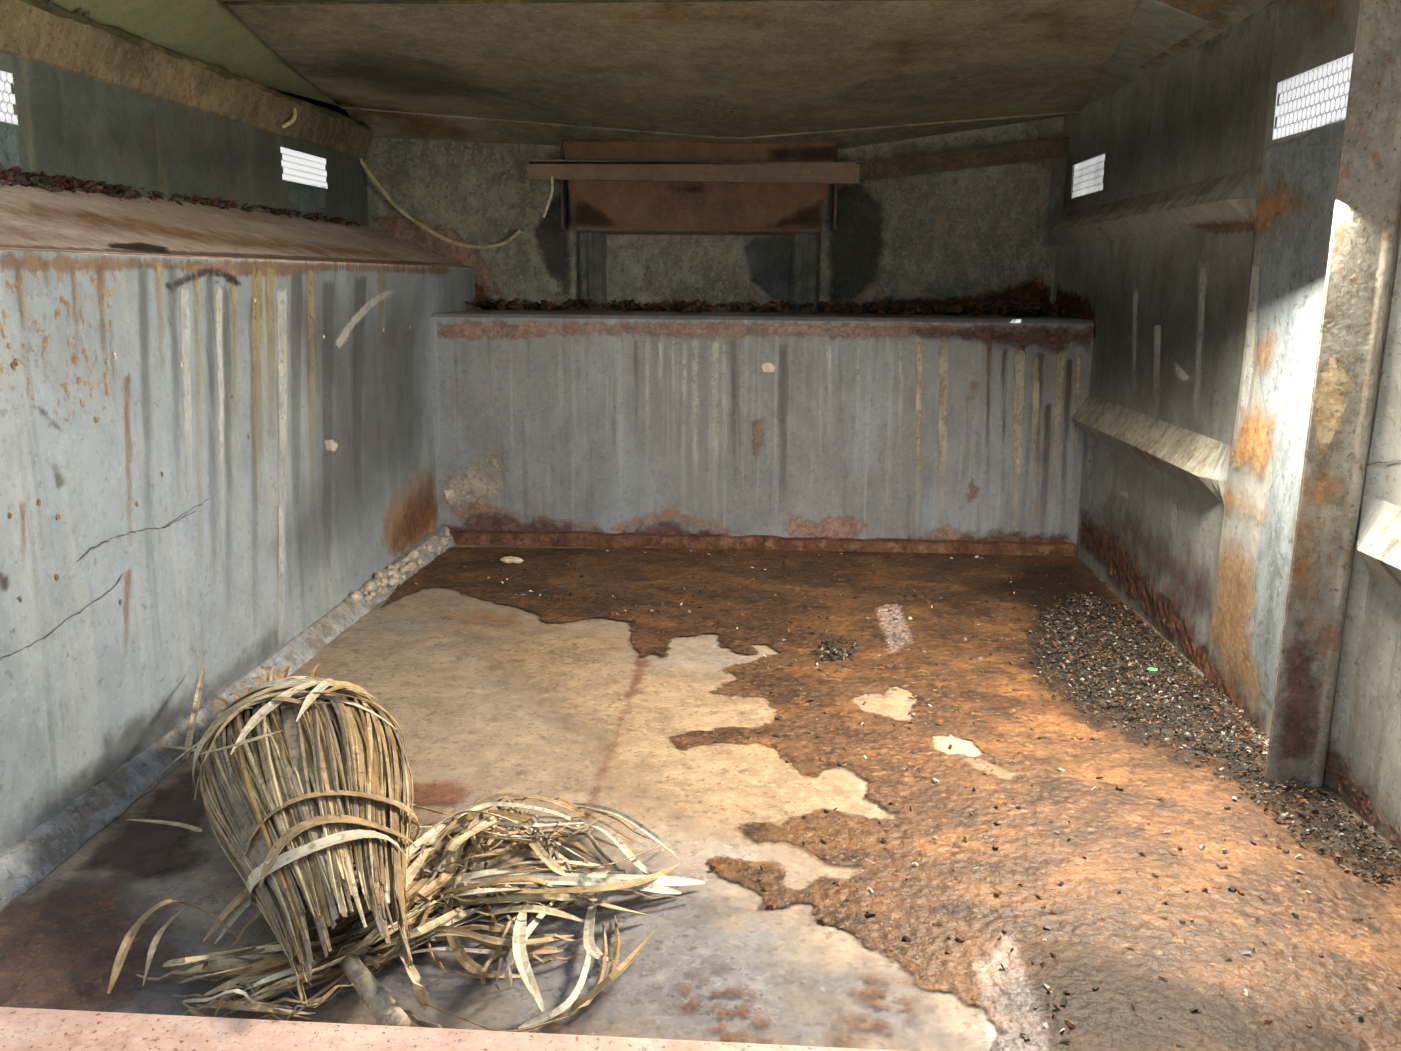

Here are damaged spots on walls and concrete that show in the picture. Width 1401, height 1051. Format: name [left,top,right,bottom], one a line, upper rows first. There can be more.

rust [0,212,1095,446]
rust [1231,415,1272,474]
rust [1312,357,1353,456]
crack [77,499,209,562]
crack [0,573,124,660]
rust [382,487,1401,1051]